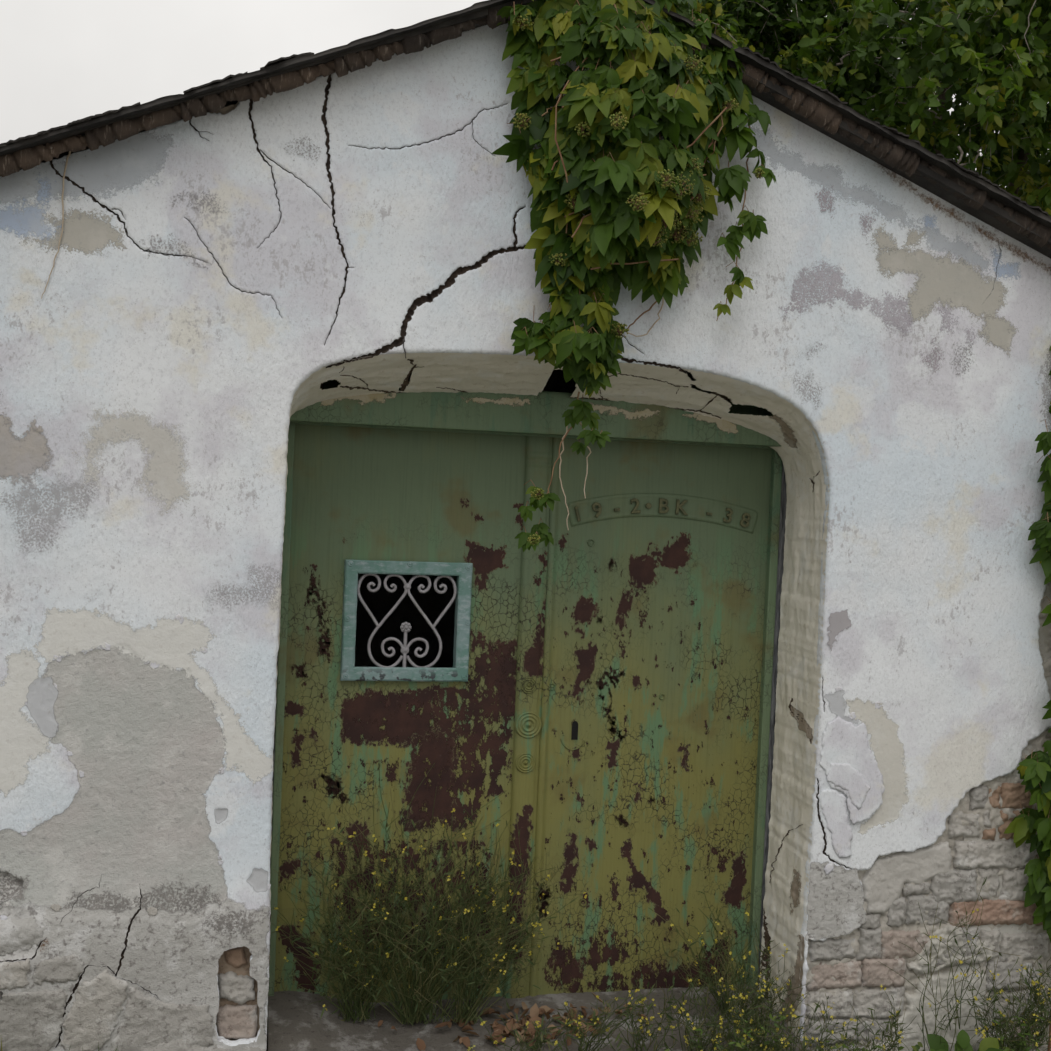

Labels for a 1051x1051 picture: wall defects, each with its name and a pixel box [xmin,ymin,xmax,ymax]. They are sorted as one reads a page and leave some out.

crack [49,160,281,316]
crack [248,75,526,393]
peeling [0,412,54,487]
crack [570,335,721,419]
spalling [1038,589,1051,678]
flaking render [0,532,749,1051]
spalling [779,687,1051,1051]
crack [55,884,159,1048]